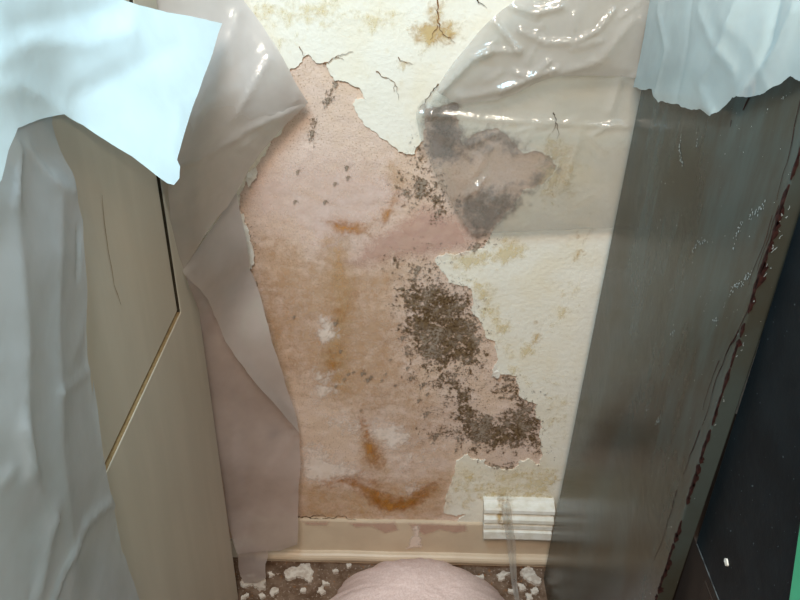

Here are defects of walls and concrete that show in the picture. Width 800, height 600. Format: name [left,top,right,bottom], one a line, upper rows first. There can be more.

damp [419,12,455,45]
flaking render [237,54,556,521]
damp [267,104,553,502]